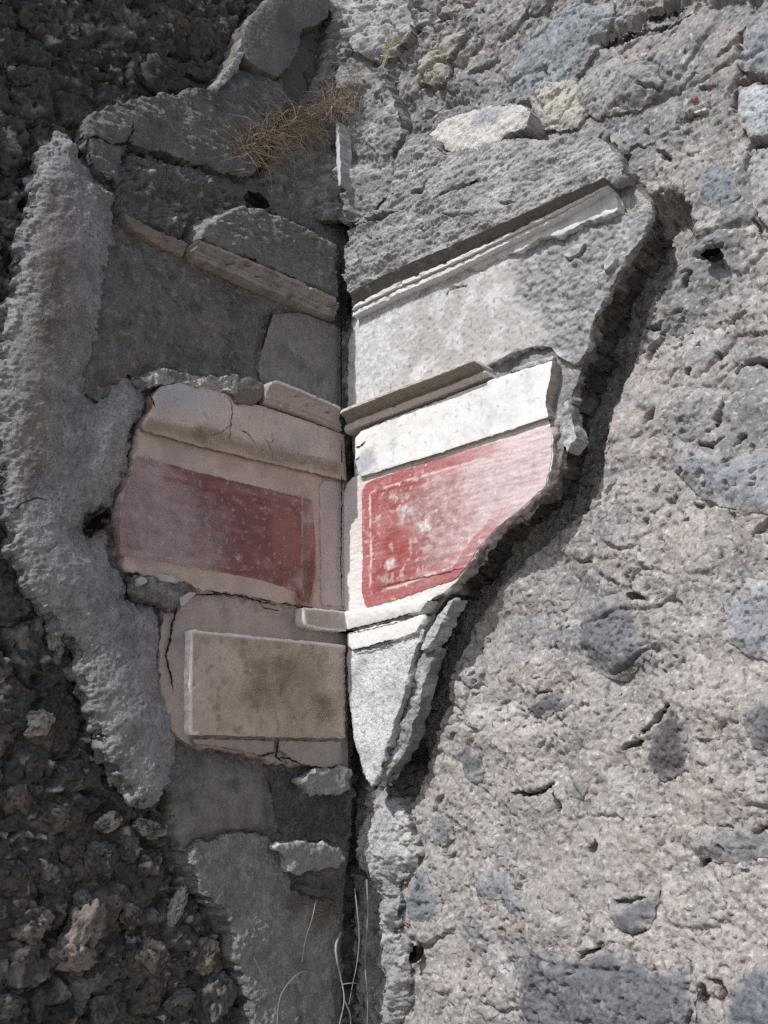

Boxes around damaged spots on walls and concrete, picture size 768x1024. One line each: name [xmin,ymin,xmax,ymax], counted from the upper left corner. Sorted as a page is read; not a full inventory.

crack [214,400,274,457]
crack [165,607,177,692]
crack [259,738,300,764]